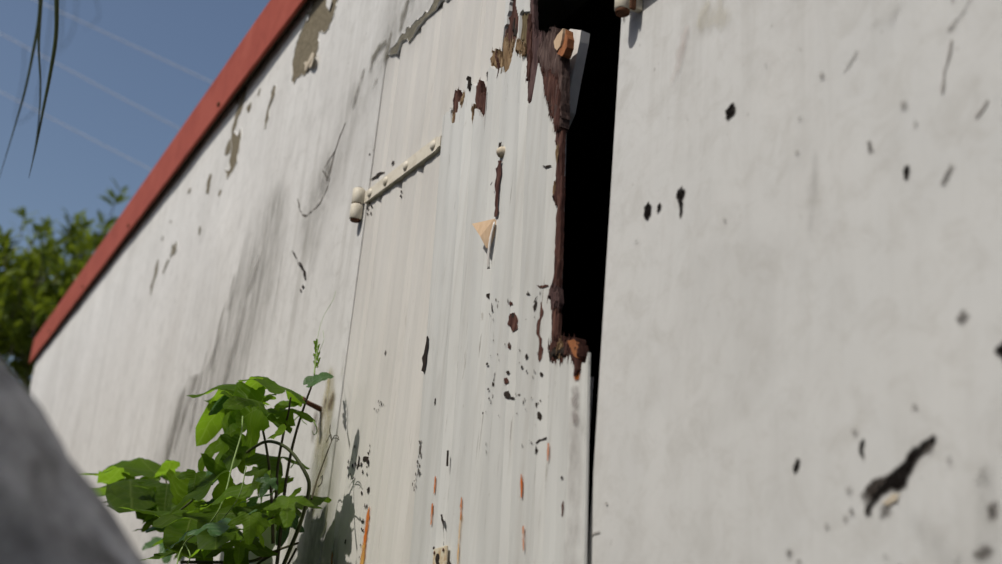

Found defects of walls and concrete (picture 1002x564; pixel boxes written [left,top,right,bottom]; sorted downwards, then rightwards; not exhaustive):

peeling [291,0,338,85]
spalling [389,0,449,56]
peeling [224,85,277,179]
peeling [486,285,549,378]
peeling [482,353,542,420]
spalling [862,435,936,517]
corrosion [360,508,369,564]